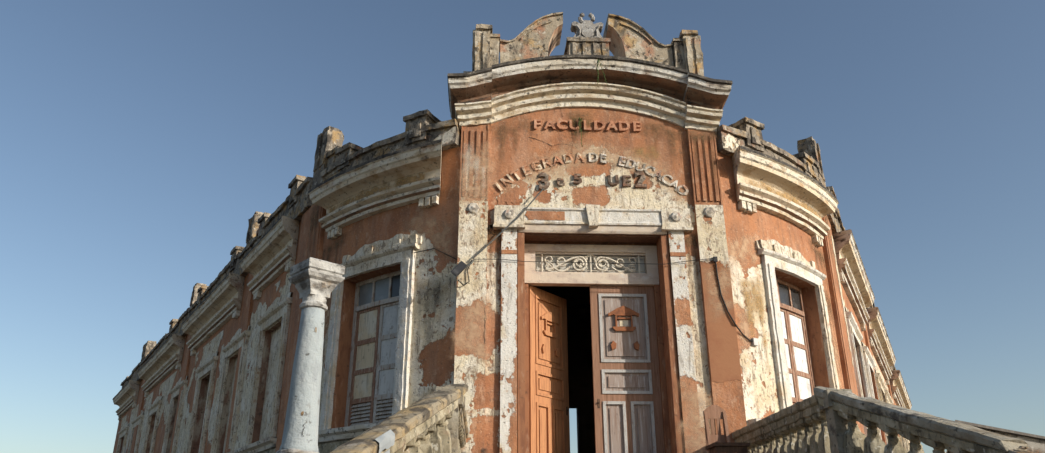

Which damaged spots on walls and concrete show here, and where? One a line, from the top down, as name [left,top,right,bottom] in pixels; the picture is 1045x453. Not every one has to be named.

peeling [408,145,780,453]